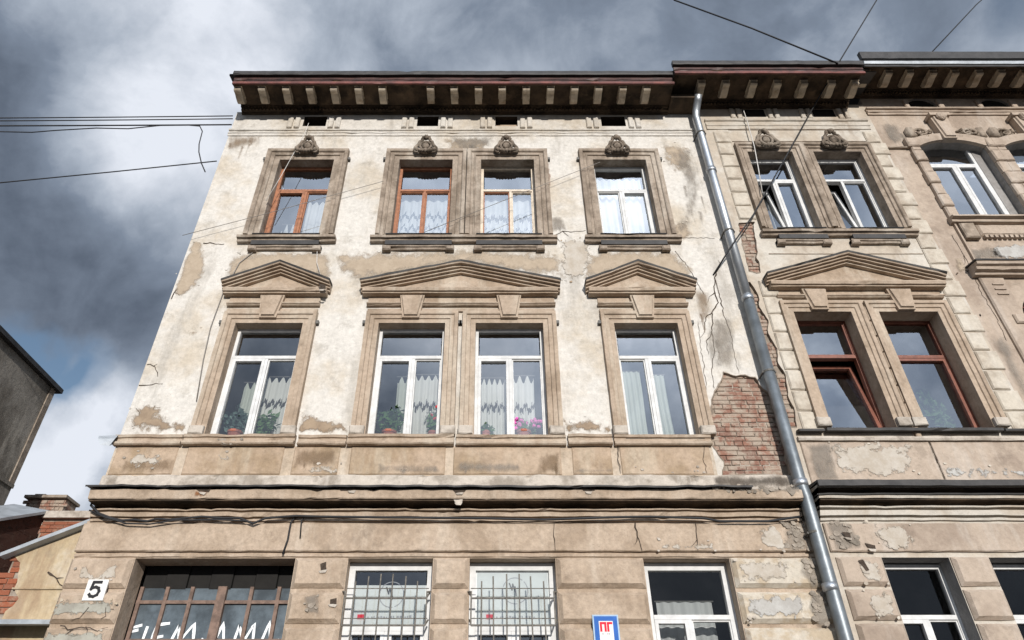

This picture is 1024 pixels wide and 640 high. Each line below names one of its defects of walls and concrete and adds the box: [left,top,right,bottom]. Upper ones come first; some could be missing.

peeling [176,241,204,295]
crack [675,237,739,387]
flaking render [710,222,799,496]
peeling [129,406,185,431]
peeling [299,414,345,433]
peeling [828,441,921,477]
peeling [747,521,830,627]
peeling [829,520,914,619]